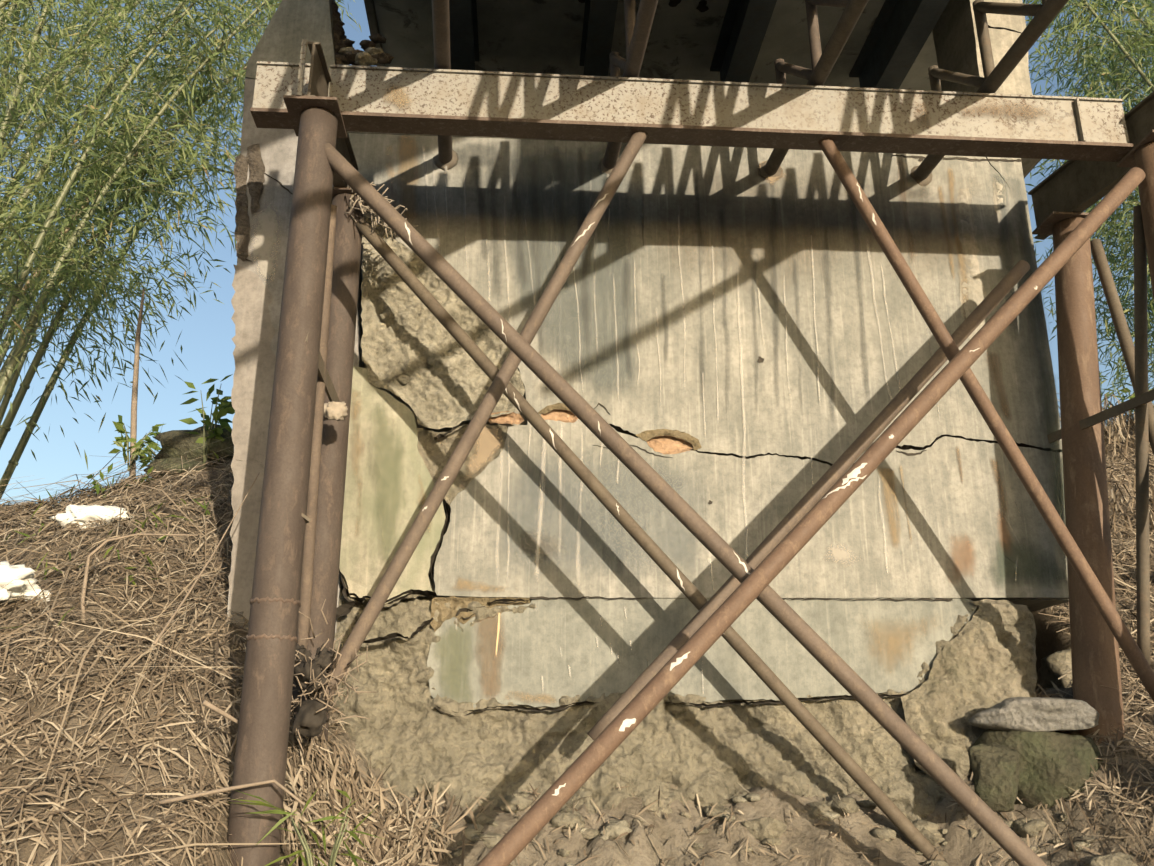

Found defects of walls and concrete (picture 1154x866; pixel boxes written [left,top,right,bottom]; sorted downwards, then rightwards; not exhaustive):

damp [519,153,634,385]
peeling [227,143,276,630]
spalling [361,217,510,484]
crack [434,422,470,440]
spalling [444,369,525,505]
crack [594,403,833,466]
crack [896,435,1062,456]
crack [336,504,450,644]
spalling [430,596,530,632]
spalling [901,599,1037,780]